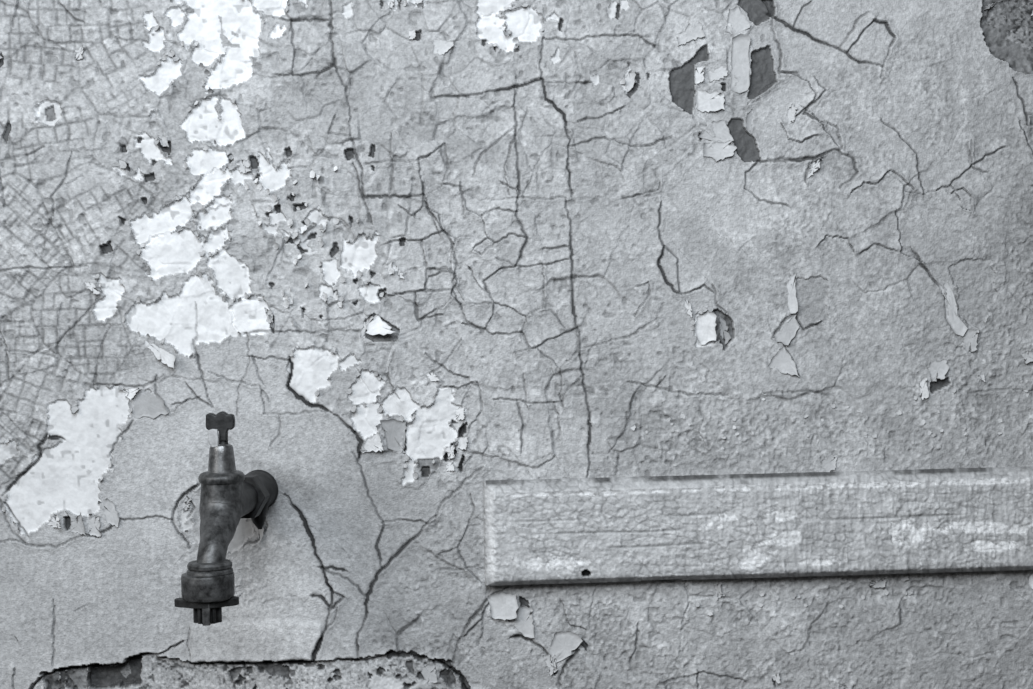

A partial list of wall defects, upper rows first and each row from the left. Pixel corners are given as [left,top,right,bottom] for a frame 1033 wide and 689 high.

crack [0,146,90,272]
peeling [85,0,405,368]
crack [273,0,729,478]
peeling [669,0,777,162]
crack [744,0,1033,264]
flaking render [980,0,1033,74]
peeling [0,385,168,538]
crack [94,325,355,448]
peeling [287,346,468,486]
crack [0,451,509,689]
flaking render [31,650,471,689]
crack [657,670,746,689]